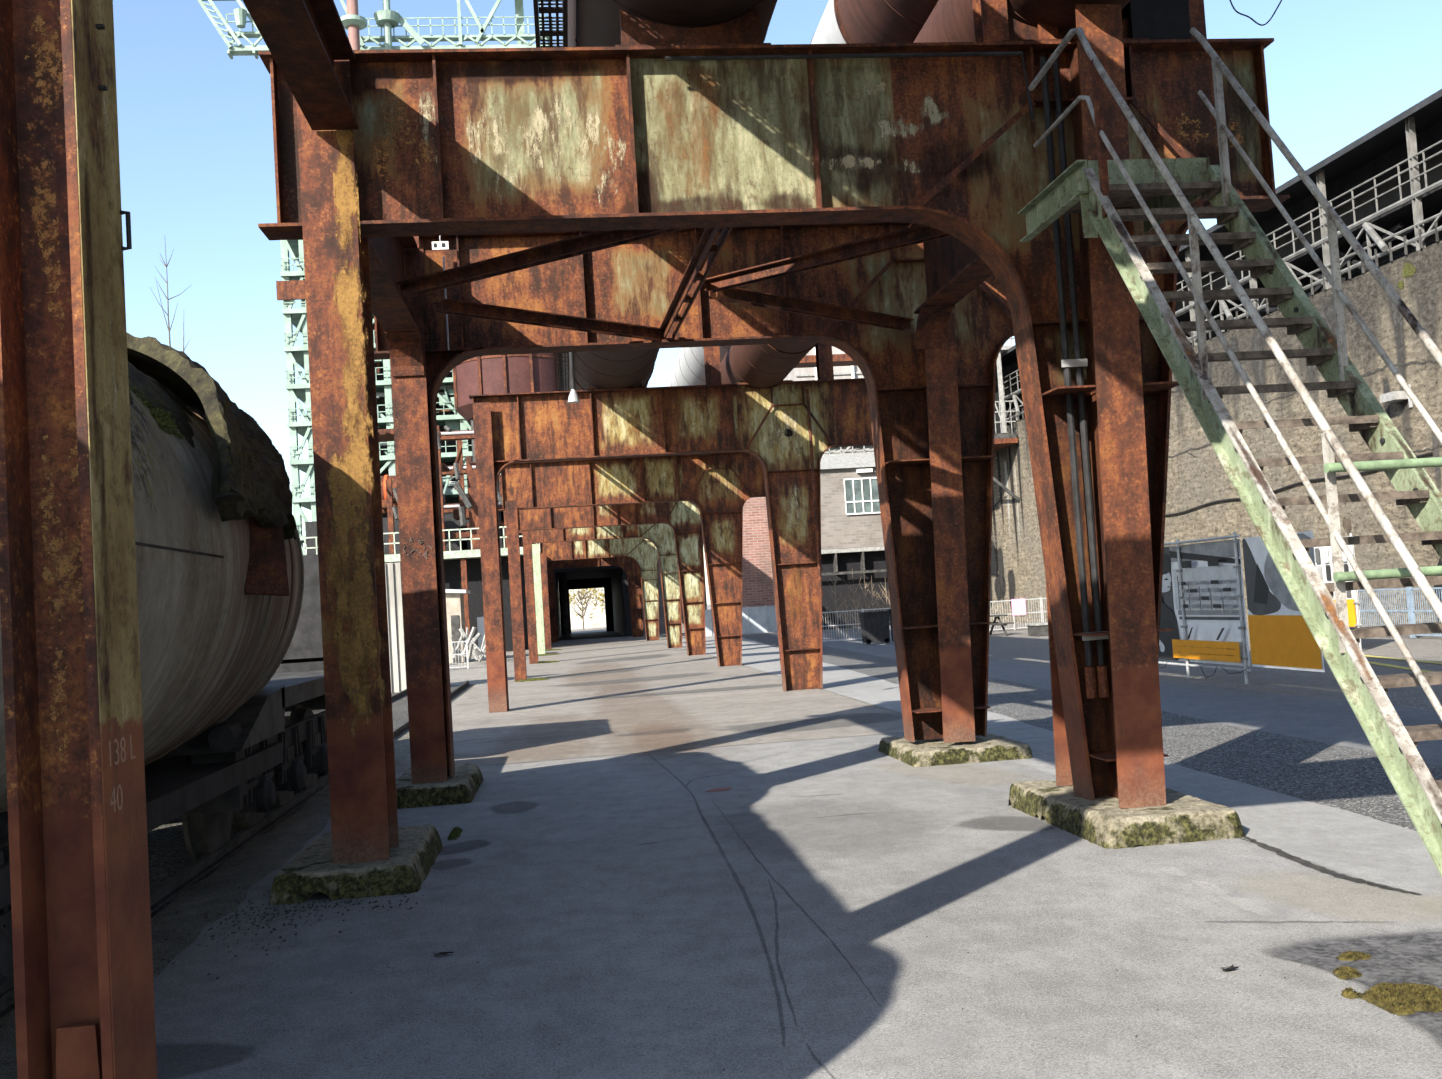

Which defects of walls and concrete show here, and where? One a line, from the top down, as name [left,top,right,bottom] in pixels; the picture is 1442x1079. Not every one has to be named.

corrosion [350,63,396,91]
corrosion [432,61,596,82]
corrosion [623,72,742,213]
corrosion [1196,80,1250,167]
corrosion [836,147,894,191]
corrosion [768,194,812,209]